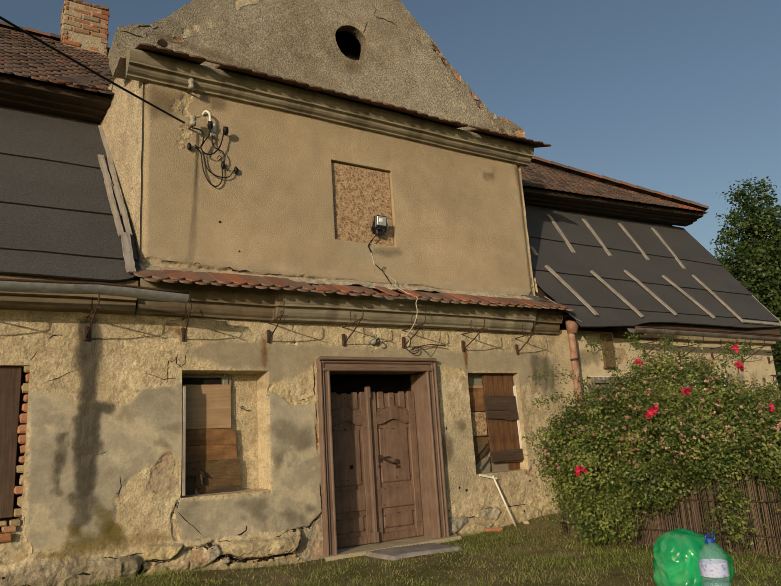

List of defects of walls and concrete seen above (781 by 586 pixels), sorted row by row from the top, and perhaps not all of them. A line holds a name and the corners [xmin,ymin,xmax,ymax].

spalling [169,90,215,149]
damp [69,319,114,531]
damp [55,433,64,491]
spalling [146,451,178,495]